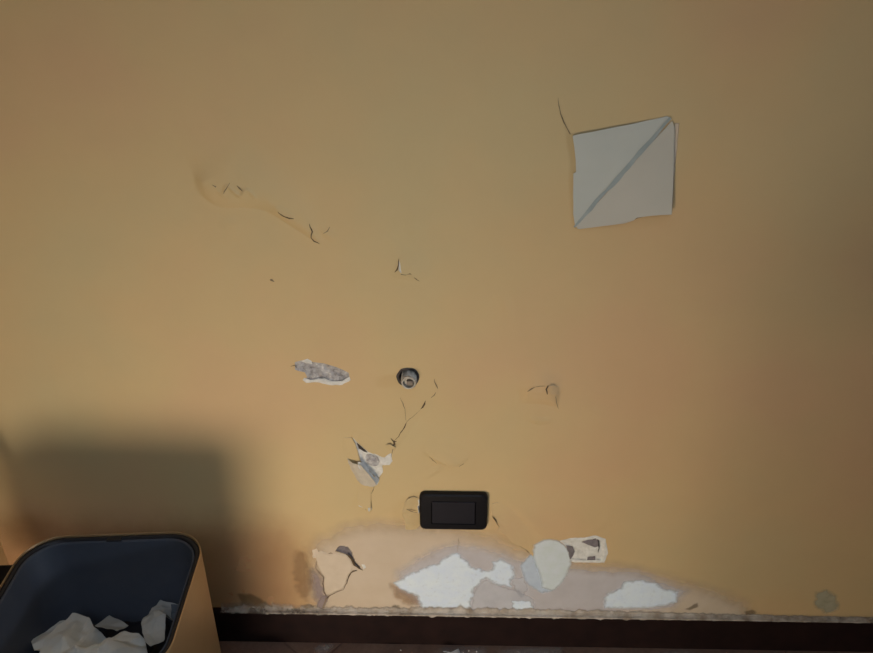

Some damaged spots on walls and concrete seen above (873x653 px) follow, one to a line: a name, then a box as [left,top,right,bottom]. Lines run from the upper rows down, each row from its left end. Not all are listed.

spalling [293,359,350,385]
crack [381,379,438,456]
peeling [342,430,392,487]
peeling [402,497,420,530]
leakage [315,525,744,615]
spalling [221,546,873,623]
spalling [560,536,608,563]